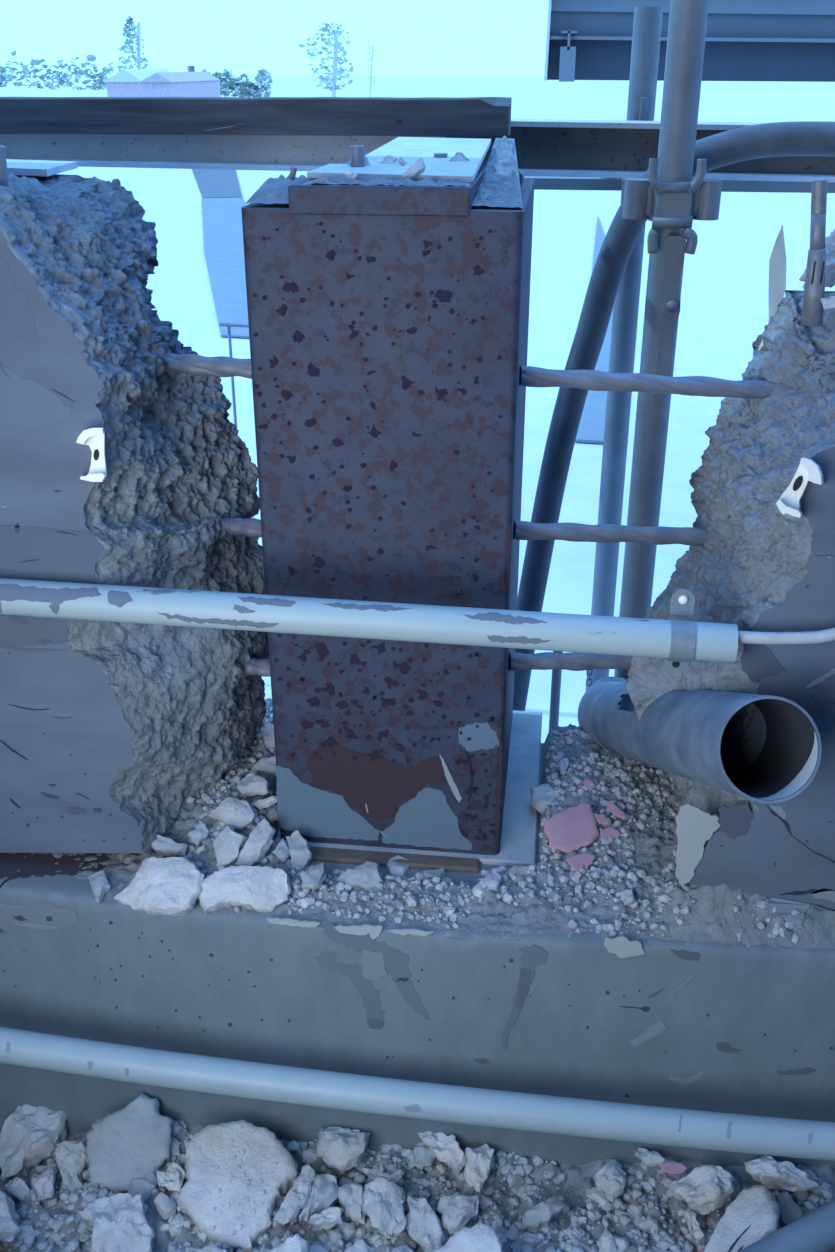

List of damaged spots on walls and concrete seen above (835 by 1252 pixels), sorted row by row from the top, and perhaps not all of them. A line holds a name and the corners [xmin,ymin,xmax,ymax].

spalling [0,172,265,595]
spalling [644,290,835,773]
spalling [67,619,269,853]
peeling [458,722,499,752]
peeling [275,765,472,851]
spalling [665,771,786,887]
crack [767,806,835,911]